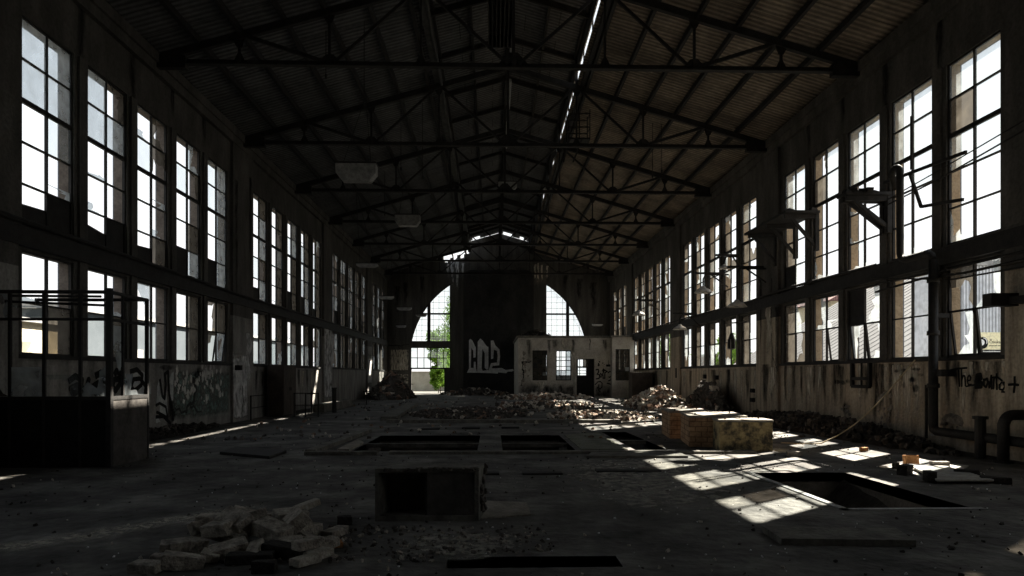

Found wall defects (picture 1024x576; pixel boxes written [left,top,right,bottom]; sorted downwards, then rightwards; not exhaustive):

leakage [858,364,919,413]